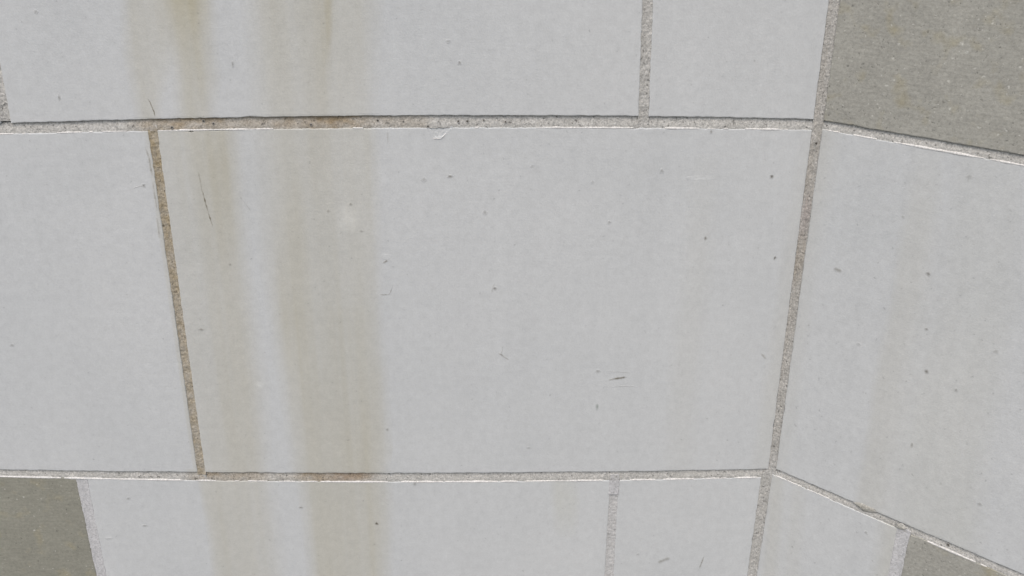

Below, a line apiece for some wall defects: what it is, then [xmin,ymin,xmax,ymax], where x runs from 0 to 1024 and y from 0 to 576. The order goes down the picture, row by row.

damp [119,0,223,117]
damp [240,0,386,115]
damp [160,130,396,576]